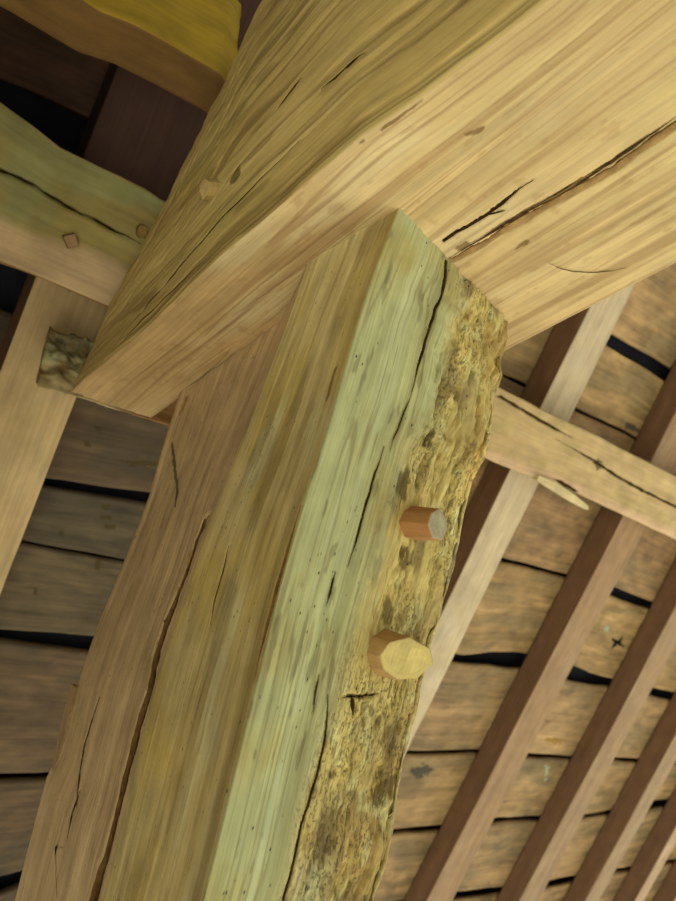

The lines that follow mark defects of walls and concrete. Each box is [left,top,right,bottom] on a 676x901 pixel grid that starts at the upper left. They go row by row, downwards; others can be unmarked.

crack [278,77,302,108]
crack [321,53,365,89]
crack [0,169,137,242]
crack [327,117,676,603]
crack [55,697,100,892]
crack [89,515,209,901]
crack [282,677,376,901]